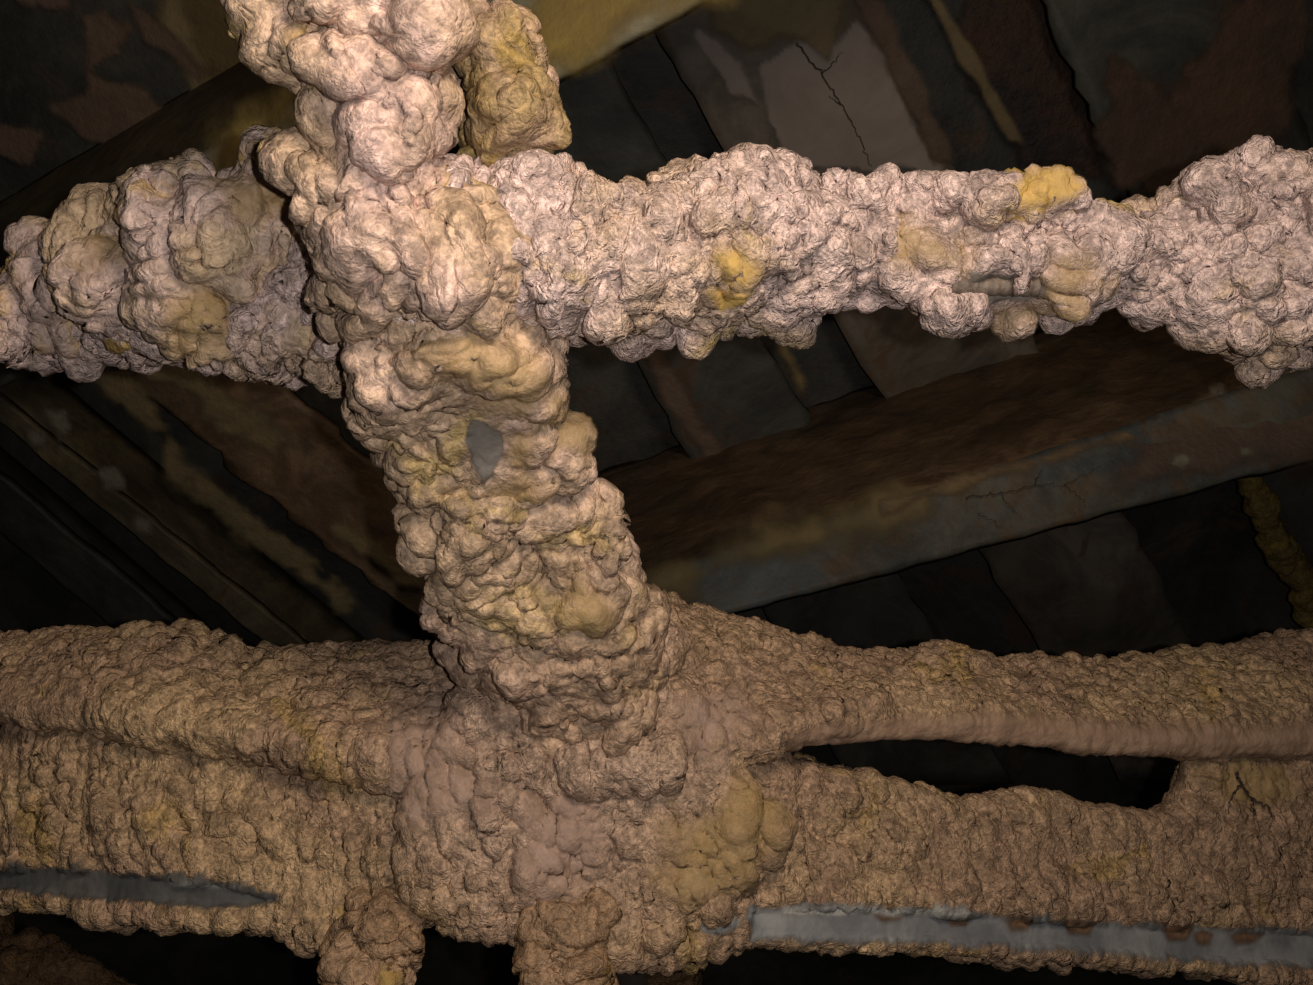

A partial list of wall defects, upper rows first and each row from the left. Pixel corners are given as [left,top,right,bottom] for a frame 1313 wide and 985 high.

peeling [782,904,974,919]